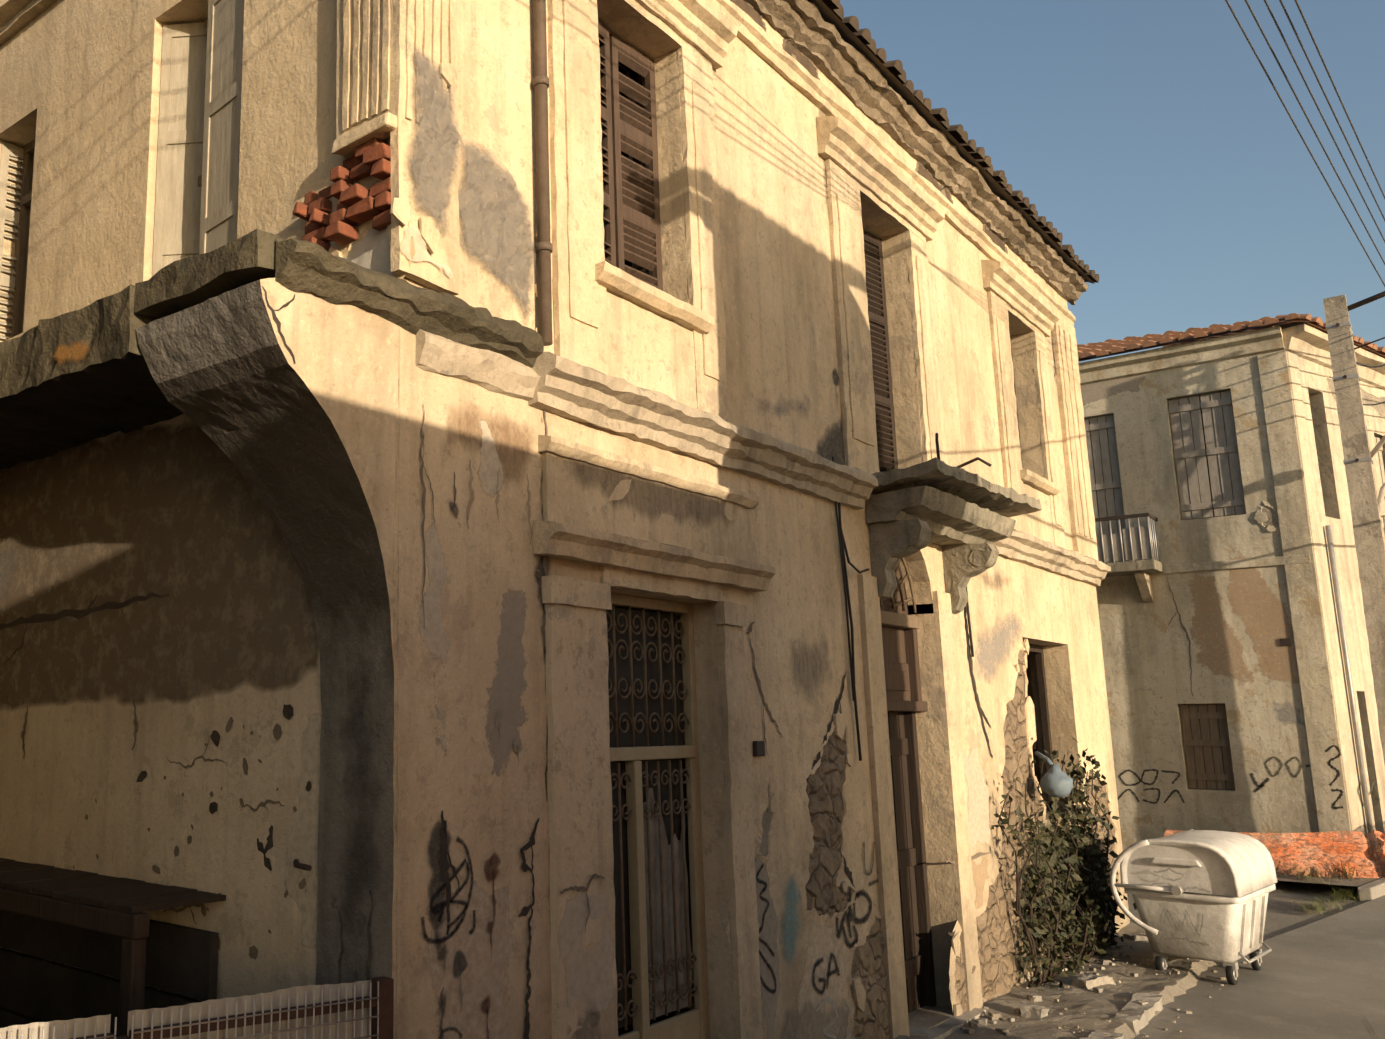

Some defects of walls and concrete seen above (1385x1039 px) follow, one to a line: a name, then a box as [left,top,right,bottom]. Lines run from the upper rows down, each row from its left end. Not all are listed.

peeling [292,51,539,333]
crack [0,592,170,664]
crack [166,741,228,769]
crack [242,799,285,812]
peeling [486,590,528,775]
crack [746,622,783,758]
spalling [798,711,857,928]
crack [965,606,993,758]
spalling [949,639,1046,1016]
crack [1167,578,1193,696]
peeling [427,853,512,1039]
spalling [844,904,889,1039]